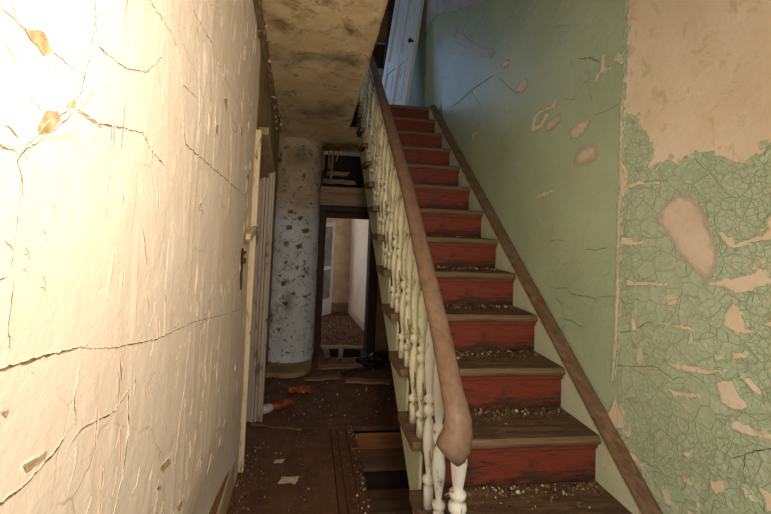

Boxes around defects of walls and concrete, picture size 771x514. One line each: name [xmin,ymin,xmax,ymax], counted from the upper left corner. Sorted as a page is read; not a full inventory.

flaking render [11,4,62,76]
flaking render [30,96,78,139]
peeling [594,0,771,384]
crack [0,0,253,514]
crack [617,365,684,380]
peeling [662,349,771,442]
peeling [630,453,649,476]
crack [728,448,771,485]
peeling [740,483,771,514]